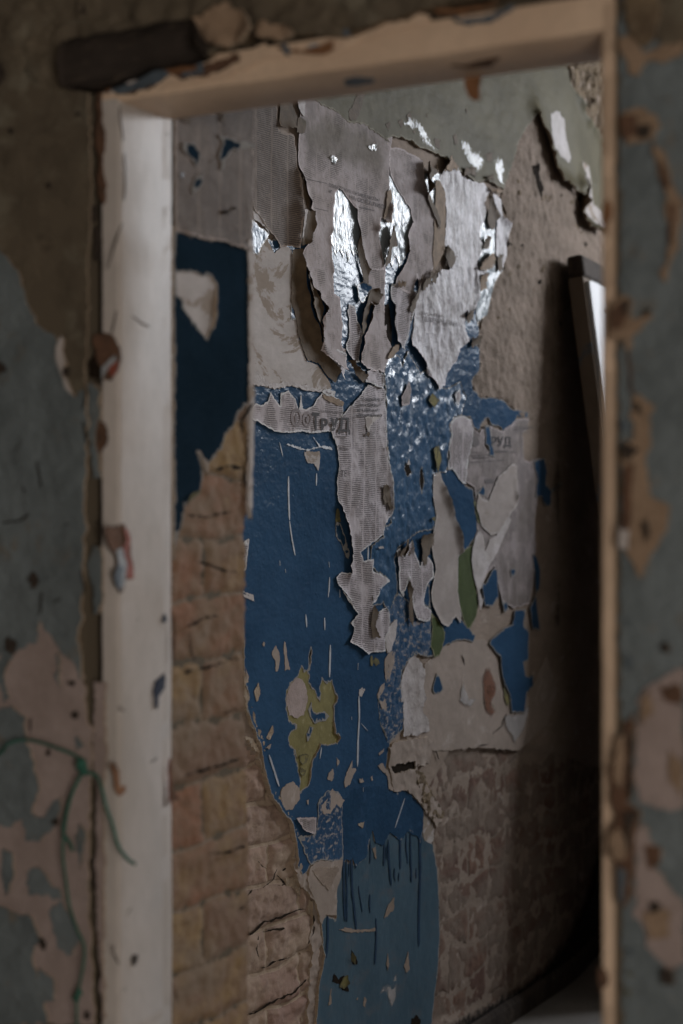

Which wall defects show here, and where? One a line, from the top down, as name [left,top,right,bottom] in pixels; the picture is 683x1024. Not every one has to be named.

flaking render [0,252,96,1024]
peeling [88,355,102,380]
flaking render [0,0,515,95]
peeling [171,57,603,1024]
peeling [609,0,683,1024]